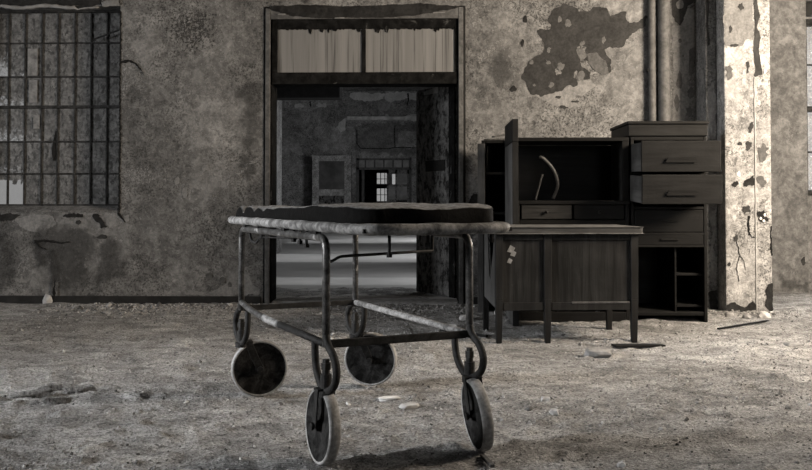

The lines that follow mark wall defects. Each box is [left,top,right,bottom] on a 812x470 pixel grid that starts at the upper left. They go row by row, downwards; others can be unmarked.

peeling [521,3,648,109]
peeling [671,0,695,121]
peeling [723,0,767,77]
peeling [737,122,769,162]
flaking render [731,171,767,187]
damp [33,229,90,290]
peeling [0,213,130,239]
crack [736,216,773,279]
flaking render [742,205,769,223]
flaking render [708,283,773,312]